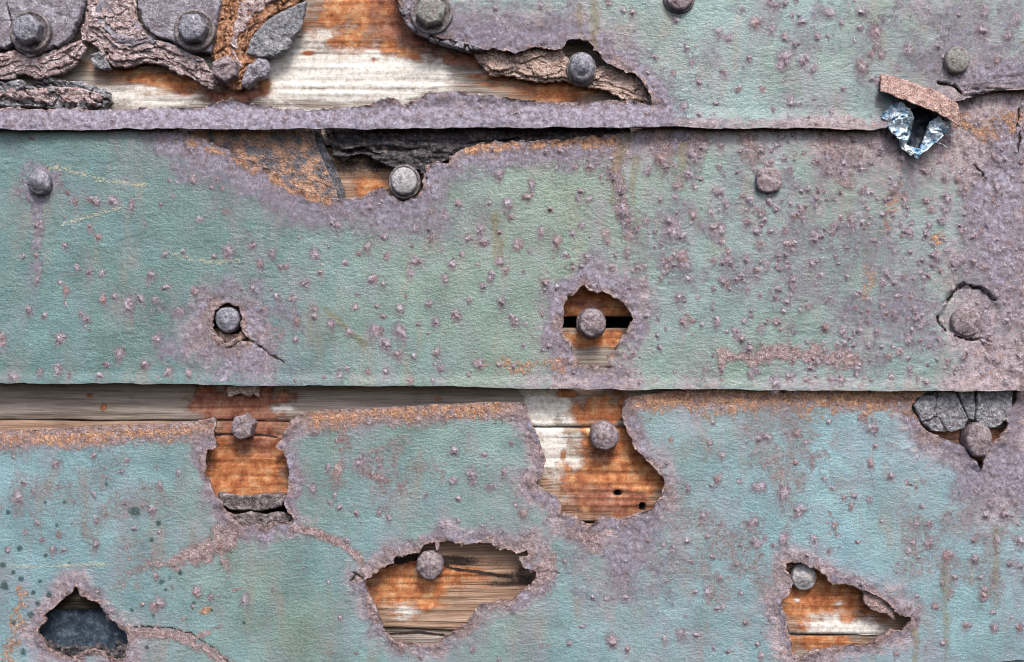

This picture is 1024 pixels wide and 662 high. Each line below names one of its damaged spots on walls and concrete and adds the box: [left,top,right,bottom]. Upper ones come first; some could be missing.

peeling [103,30,462,111]
rust [865,128,905,163]
crack [936,282,996,342]
crack [226,340,285,362]
rust [0,233,550,590]
peeling [518,389,585,484]
peeling [395,606,418,620]
peeling [797,601,886,635]